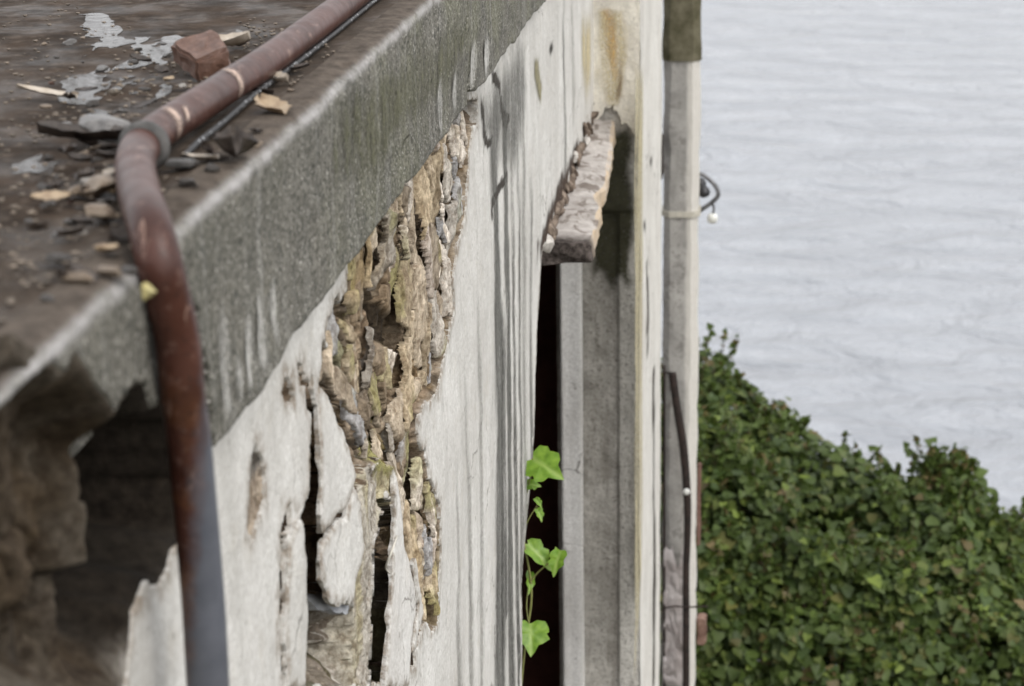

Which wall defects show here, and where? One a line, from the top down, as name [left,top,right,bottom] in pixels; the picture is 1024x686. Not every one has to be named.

leakage [470,41,489,84]
flaking render [541,105,599,261]
flaking render [280,110,473,686]
leakage [457,54,542,686]
flaking render [247,449,263,536]